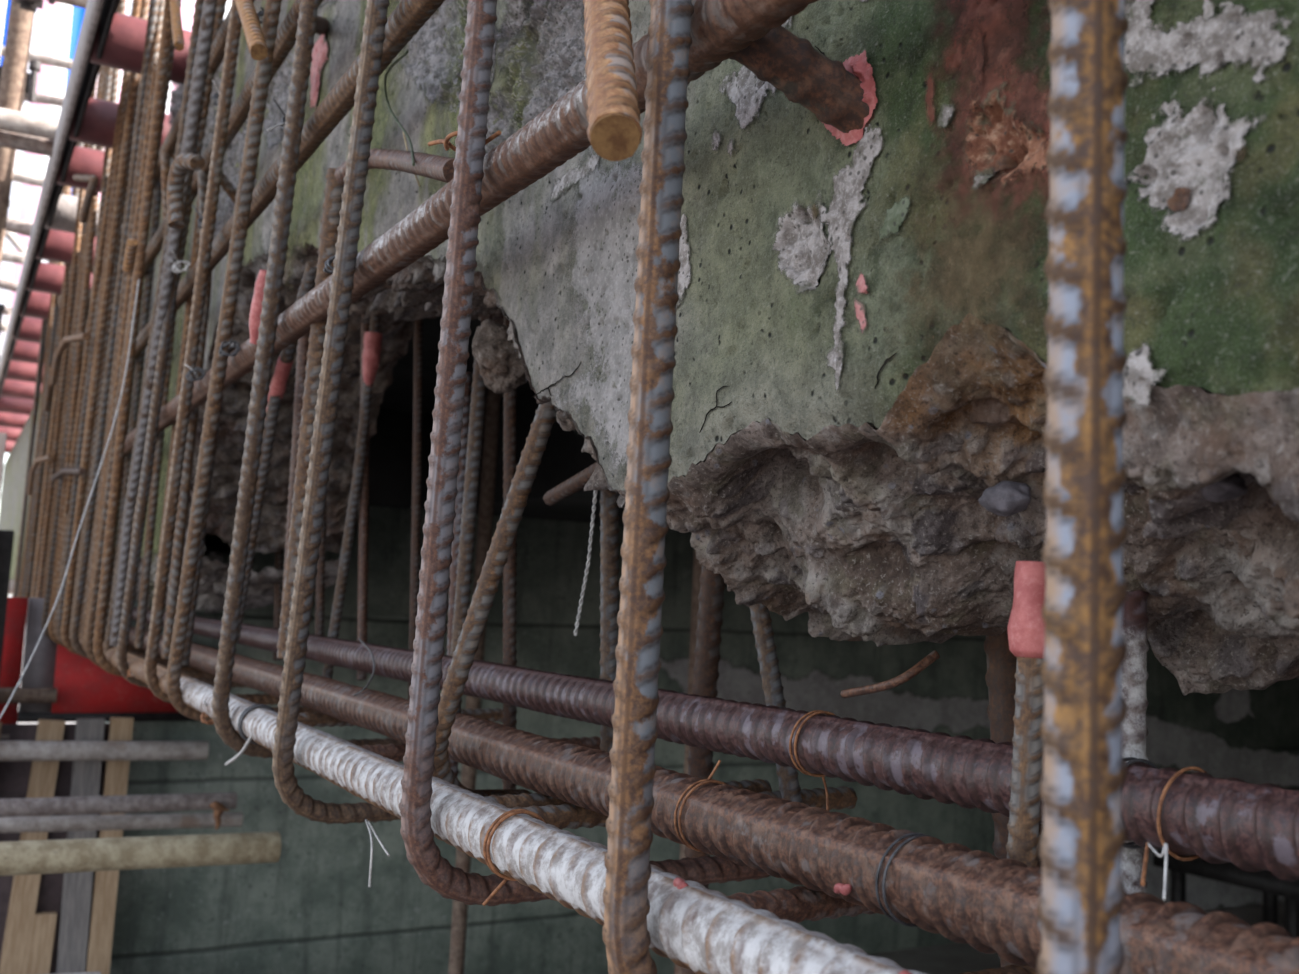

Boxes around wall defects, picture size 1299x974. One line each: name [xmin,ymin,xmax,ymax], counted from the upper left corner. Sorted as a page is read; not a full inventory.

corrosion [925,0,1052,216]
spalling [1125,97,1266,241]
water stain [909,151,1050,363]
water stain [834,340,844,392]
spalling [237,624,282,660]
spalling [502,534,517,666]
spalling [502,703,517,728]
peeling [716,658,766,705]
peeling [781,669,990,735]
spalling [796,714,1013,818]
spalling [1146,715,1299,881]